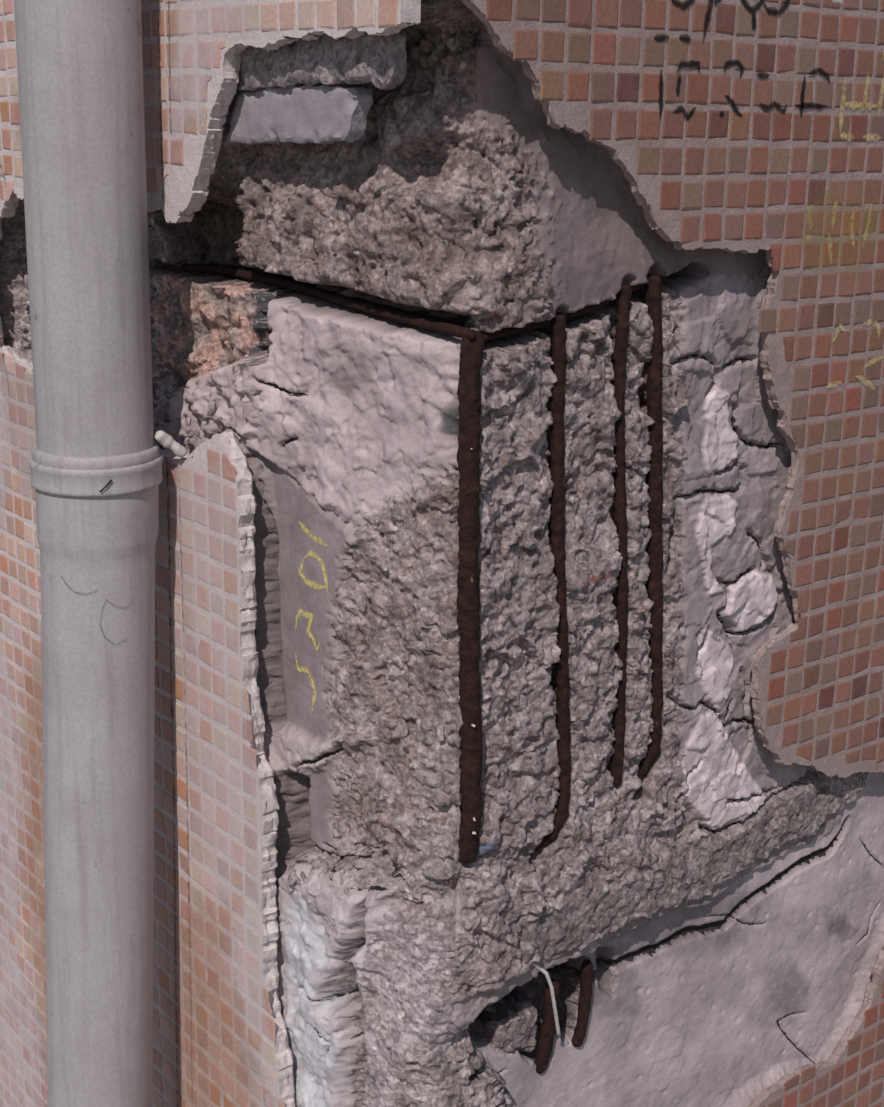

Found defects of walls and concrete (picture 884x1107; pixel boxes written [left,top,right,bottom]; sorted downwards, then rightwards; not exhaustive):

spalling [147,0,554,410]
spalling [0,199,32,363]
peeling [208,397,224,430]
crack [256,378,308,397]
crack [671,354,750,367]
crack [677,410,779,497]
crack [701,532,767,646]
spalling [273,274,884,1107]
crack [667,680,754,727]
crack [546,827,882,978]
crack [477,988,522,1022]